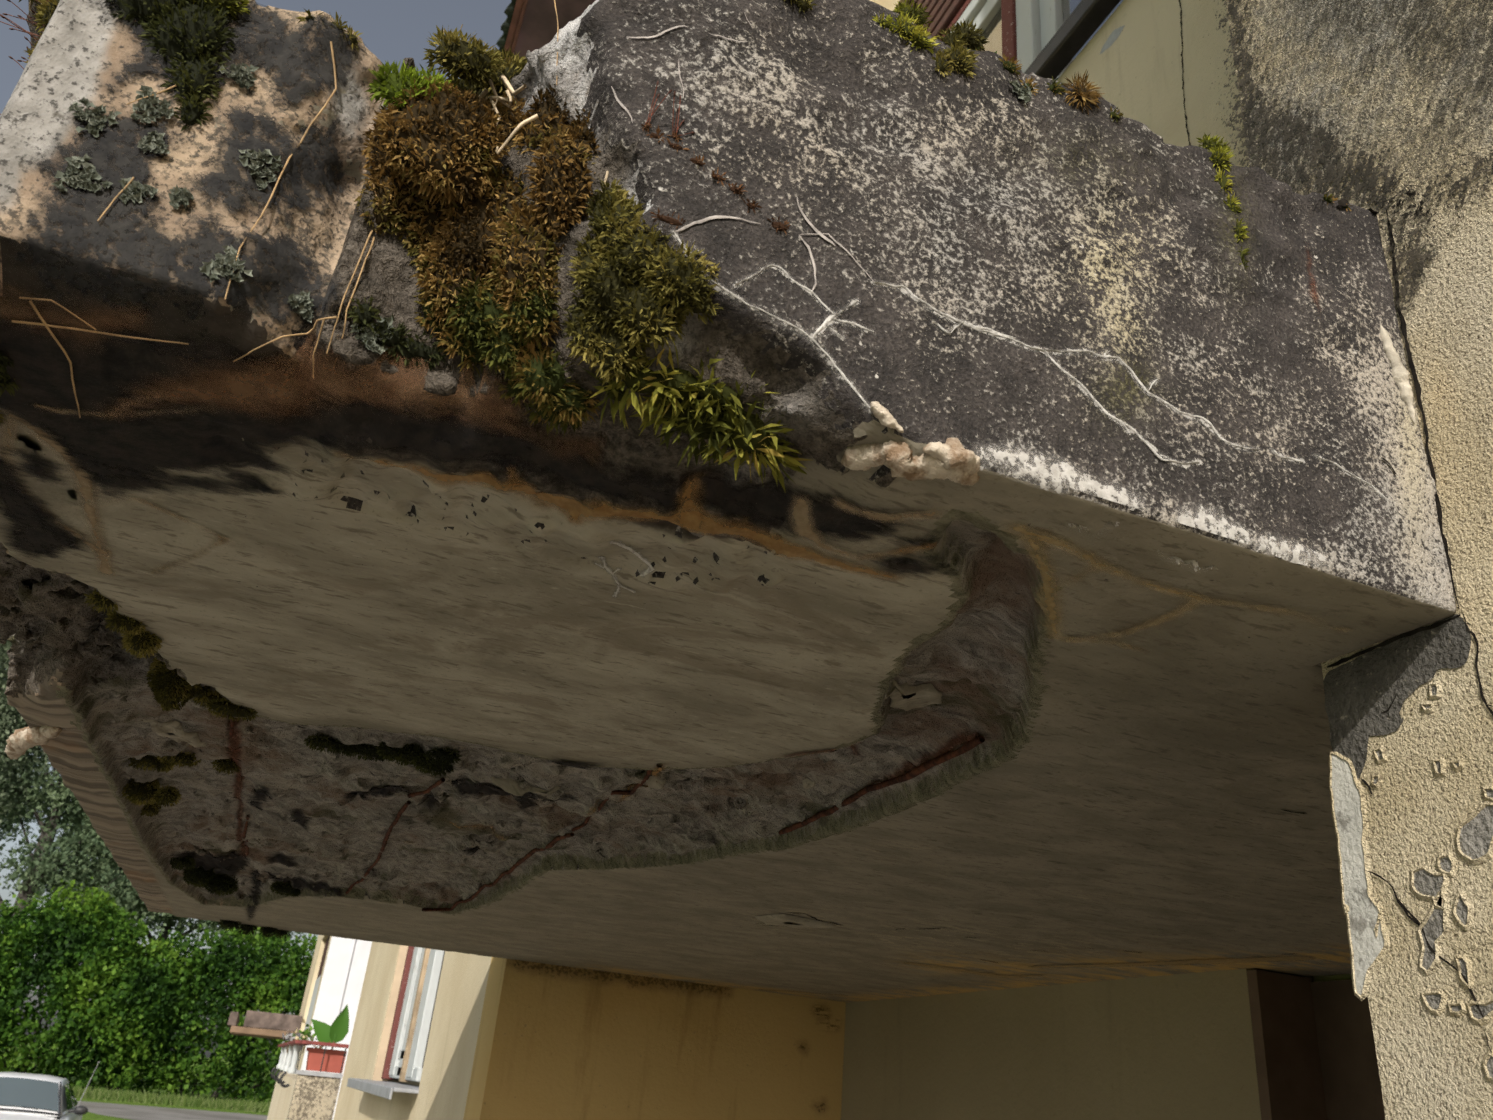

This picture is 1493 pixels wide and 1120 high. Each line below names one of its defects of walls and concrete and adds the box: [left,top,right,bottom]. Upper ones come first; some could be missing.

spalling [26,0,48,50]
crack [1179,0,1191,145]
leakage [1214,0,1493,311]
spalling [0,509,1064,919]
spalling [314,0,868,555]
leakage [871,538,950,574]
leakage [835,401,1139,526]
crack [671,197,1398,500]
leakage [1178,506,1326,568]
crack [1463,614,1493,716]
peeling [1329,745,1390,1001]
peeling [1410,785,1493,1026]